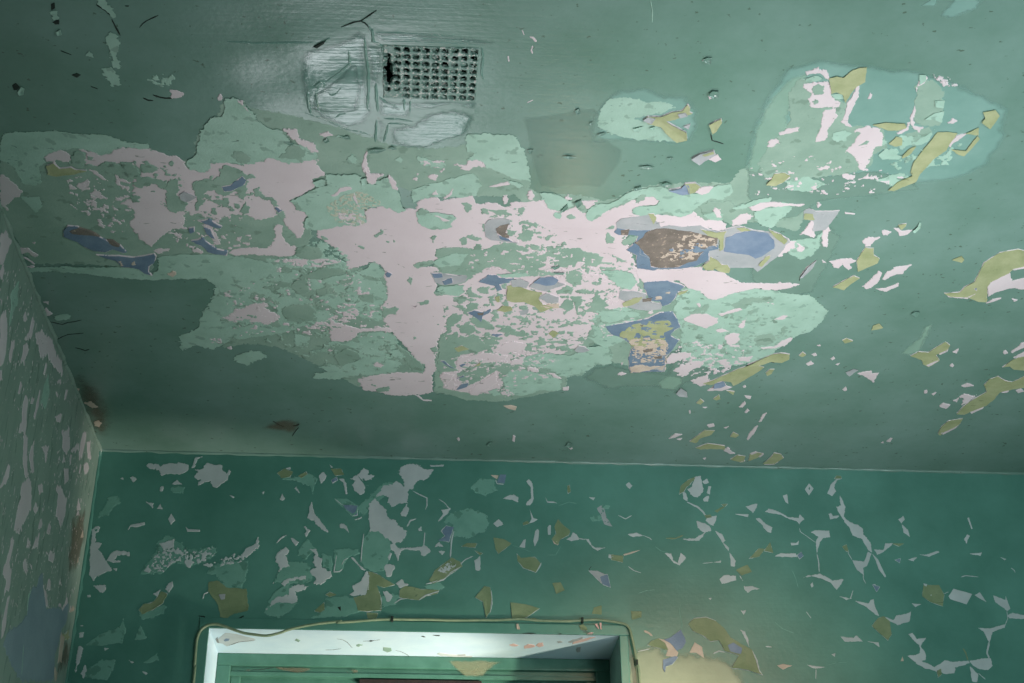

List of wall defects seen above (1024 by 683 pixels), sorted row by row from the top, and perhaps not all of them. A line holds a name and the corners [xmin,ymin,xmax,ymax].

peeling [96,0,121,87]
peeling [0,67,1000,414]
peeling [945,249,1024,303]
peeling [0,281,91,639]
peeling [75,496,259,680]
peeling [146,456,231,493]
peeling [264,464,641,619]
peeling [630,617,763,683]
peeling [667,475,1024,682]
peeling [924,342,1024,435]